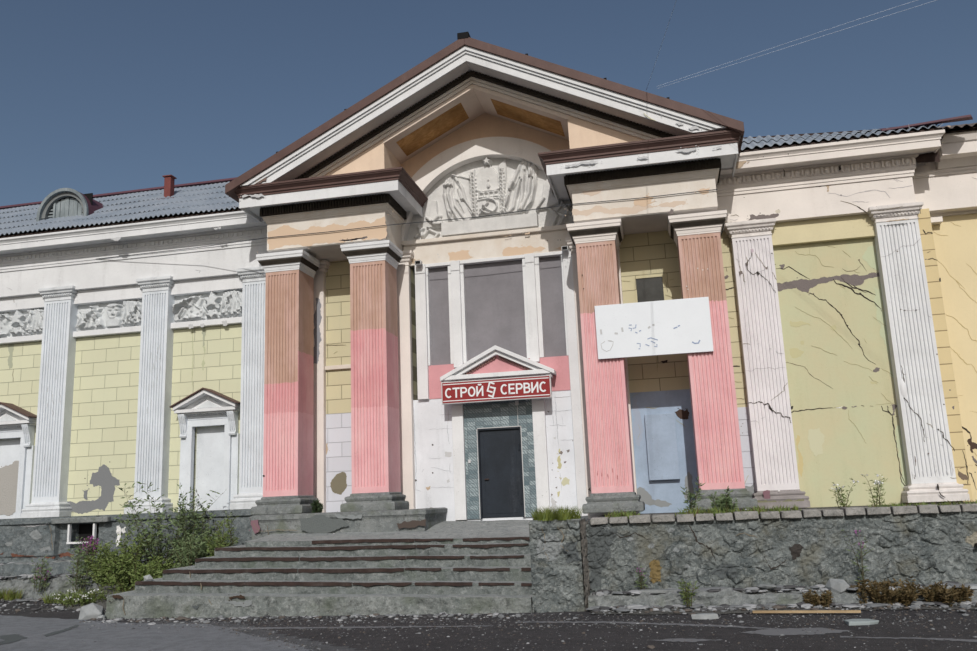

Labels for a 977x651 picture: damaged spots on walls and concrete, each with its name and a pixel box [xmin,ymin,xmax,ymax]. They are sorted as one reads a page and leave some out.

spalling [749,209,780,220]
crack [726,214,977,490]
peeling [67,464,120,514]